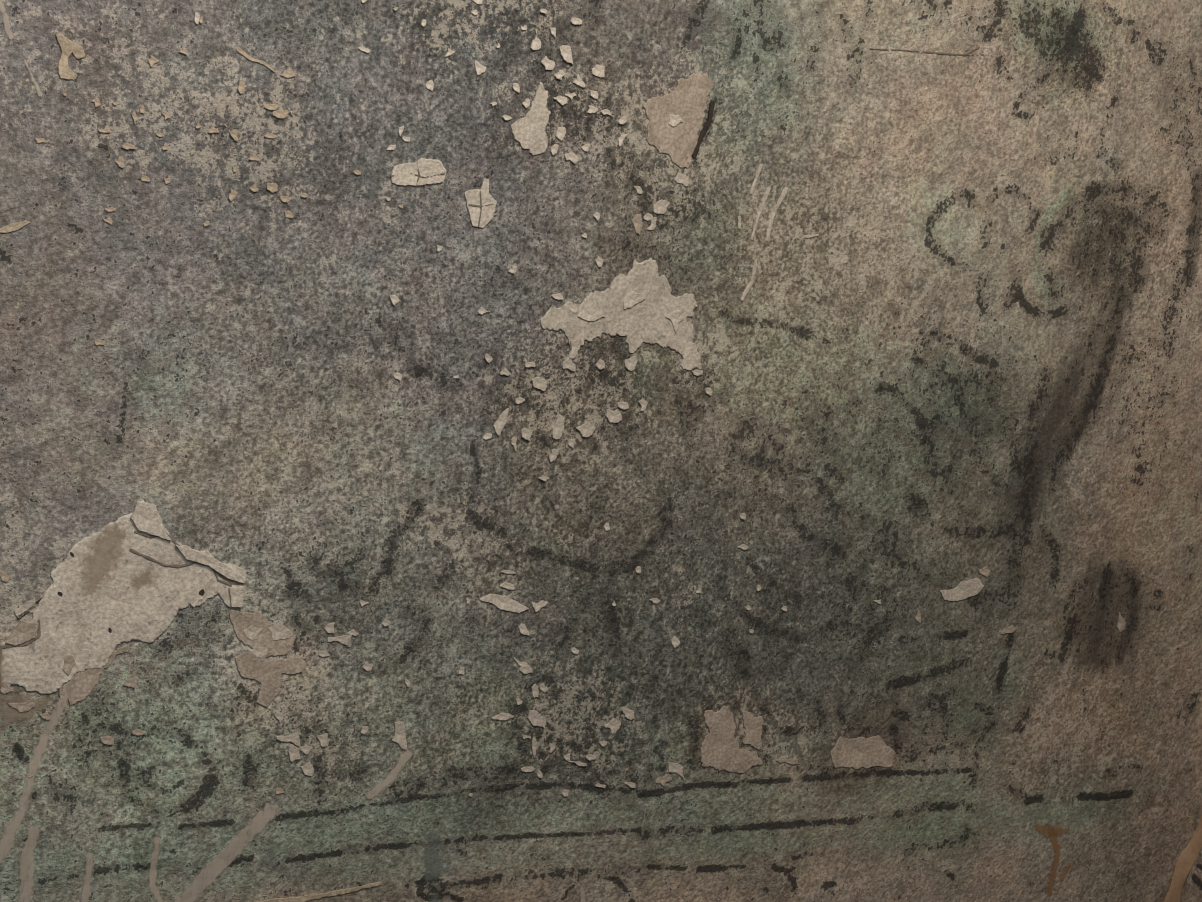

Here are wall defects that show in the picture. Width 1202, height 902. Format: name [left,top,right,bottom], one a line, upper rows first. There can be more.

spalling [490,9,628,164]
spalling [642,72,715,187]
spalling [385,158,446,209]
spalling [464,178,497,228]
spalling [632,199,670,235]
spalling [540,258,713,396]
peeling [483,397,532,452]
peeling [548,399,648,462]
spalling [0,499,359,777]
spalling [700,706,803,774]
spalling [830,735,896,769]
corrosion [1035,824,1071,896]